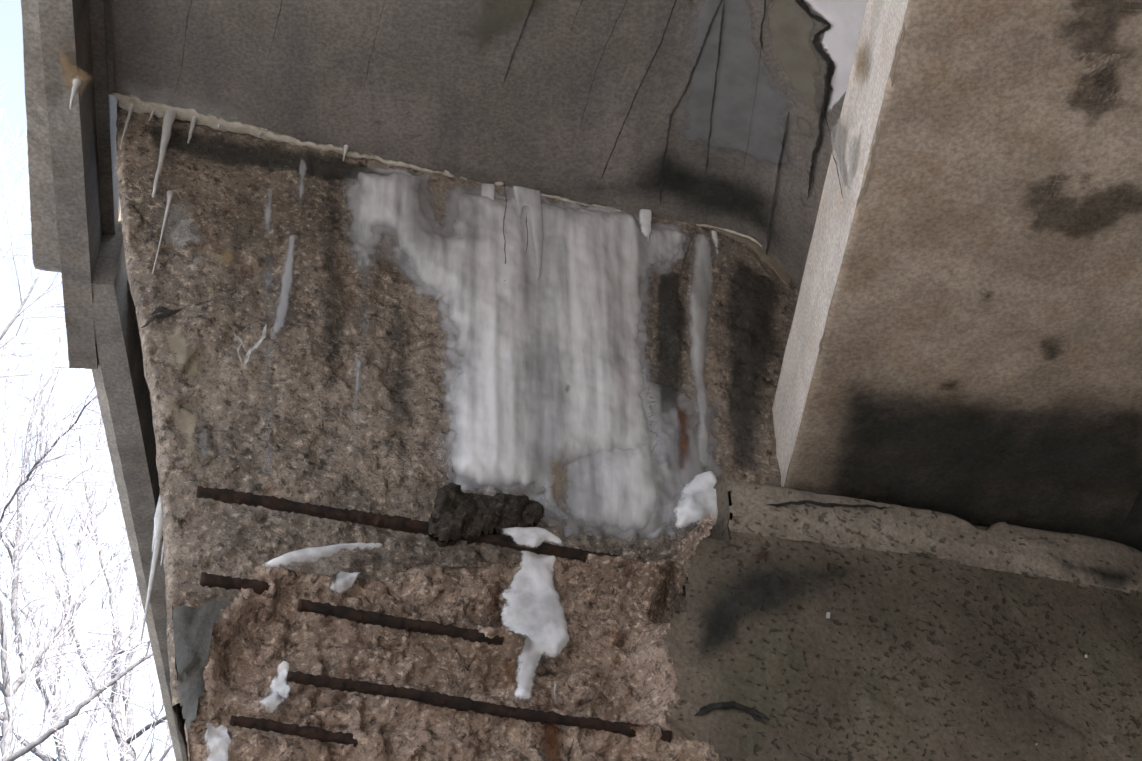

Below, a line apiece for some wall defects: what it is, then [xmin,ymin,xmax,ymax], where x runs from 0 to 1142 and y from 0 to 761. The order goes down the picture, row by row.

crack [504,0,535,81]
crack [601,0,677,179]
crack [660,0,725,205]
crack [758,0,766,52]
crack [795,0,843,199]
damp [1069,0,1142,117]
damp [481,182,625,273]
crack [766,111,790,255]
damp [1031,177,1142,236]
damp [639,159,792,466]
peeling [177,406,202,457]
spalling [184,486,719,761]